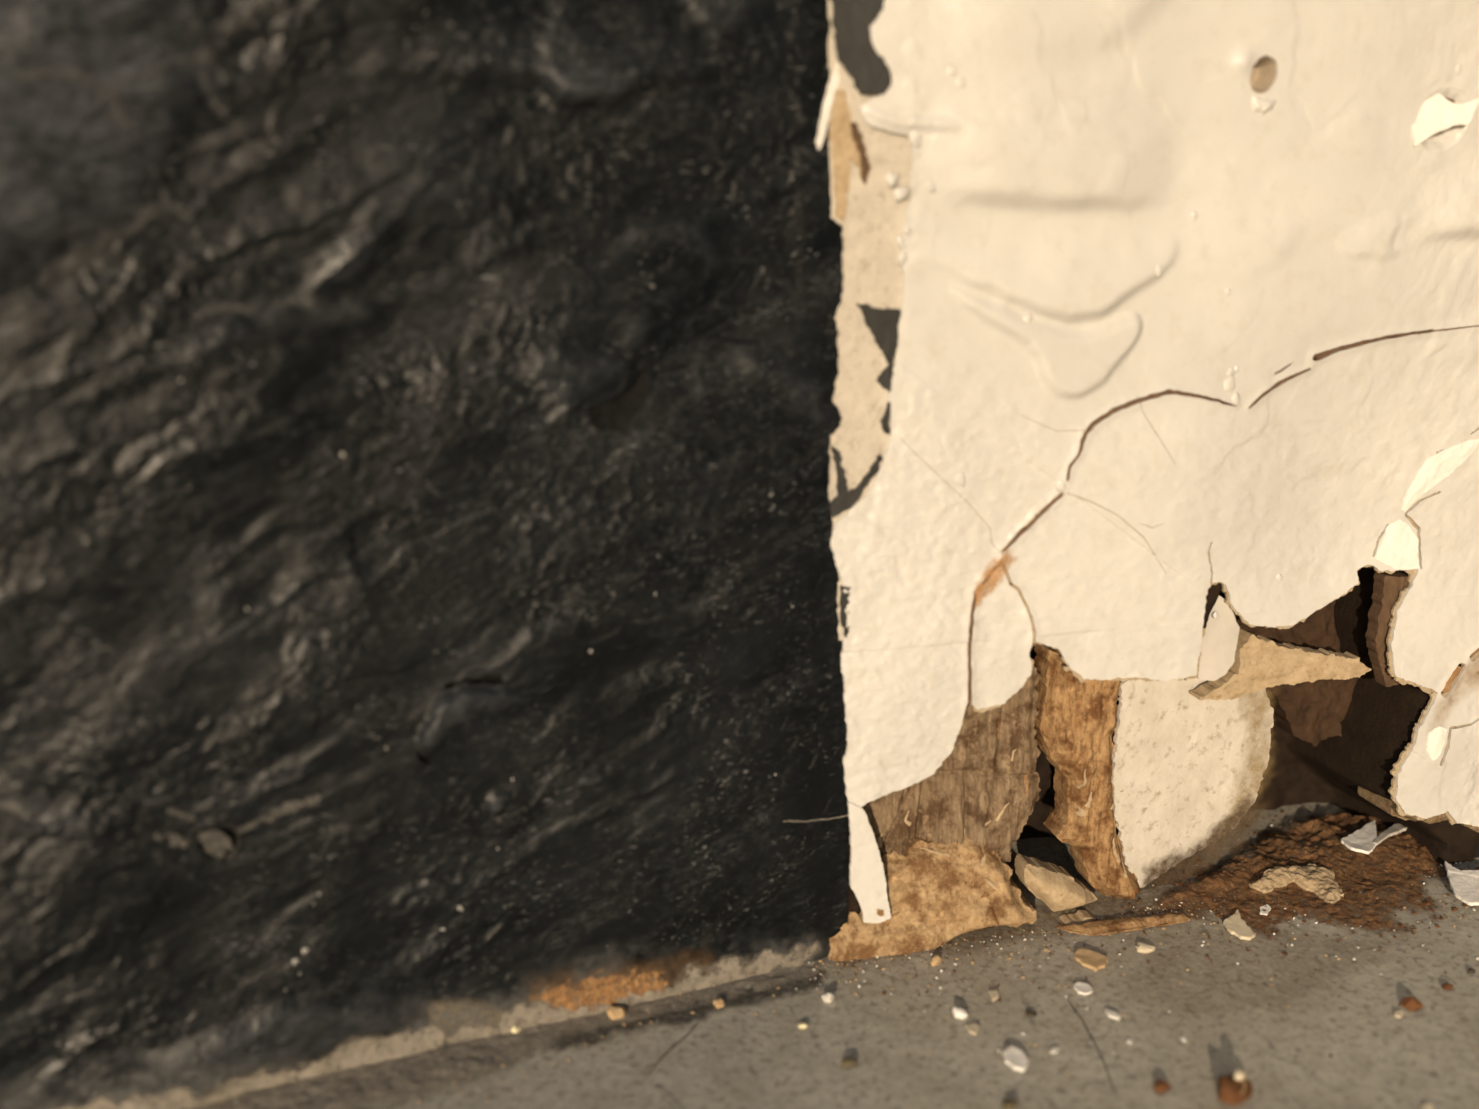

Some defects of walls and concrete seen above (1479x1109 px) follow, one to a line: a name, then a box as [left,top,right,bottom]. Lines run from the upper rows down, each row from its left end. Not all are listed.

peeling [815,61,871,220]
crack [900,325,1479,704]
peeling [1111,678,1274,888]
spalling [1341,786,1479,854]
peeling [1426,726,1455,761]
peeling [1223,904,1271,940]